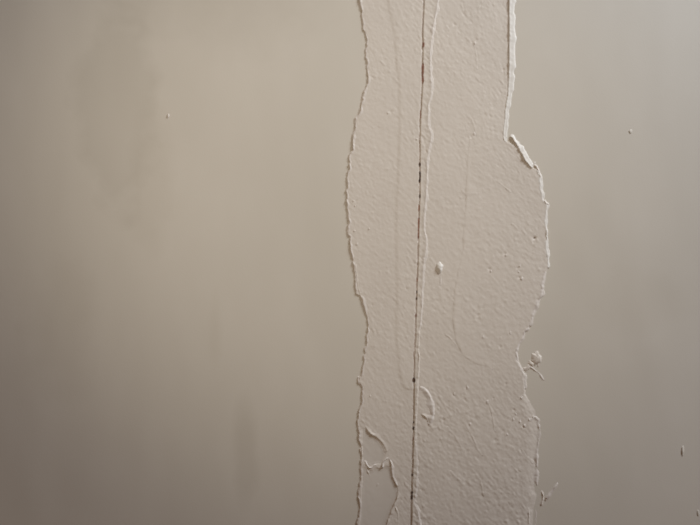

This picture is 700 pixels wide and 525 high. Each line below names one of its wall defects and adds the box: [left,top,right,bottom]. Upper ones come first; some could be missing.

crack [417,0,425,218]
peeling [503,0,541,177]
spalling [361,426,388,466]
crack [410,238,419,523]
peeling [515,351,544,389]